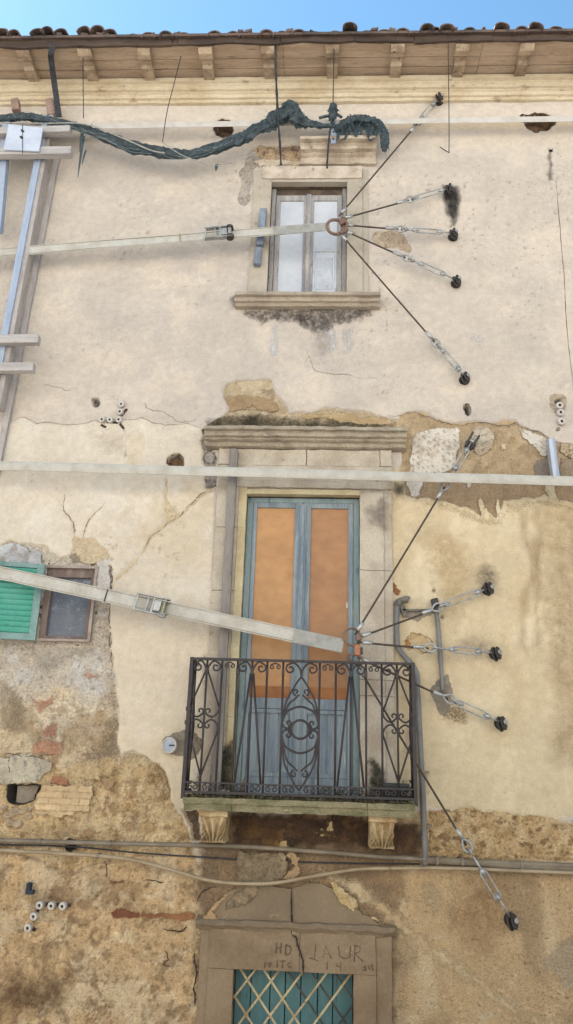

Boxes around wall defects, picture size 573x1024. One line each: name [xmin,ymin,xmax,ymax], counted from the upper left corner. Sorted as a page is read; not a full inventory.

spalling [520,112,556,133]
spalling [237,145,301,206]
water stain [245,309,370,355]
crack [11,404,200,428]
spalling [212,380,573,523]
crack [62,497,103,540]
spalling [0,537,112,589]
crack [108,478,217,670]
spalling [0,589,201,872]
spalling [428,807,573,861]
flaking render [111,894,229,921]
crack [290,889,304,975]